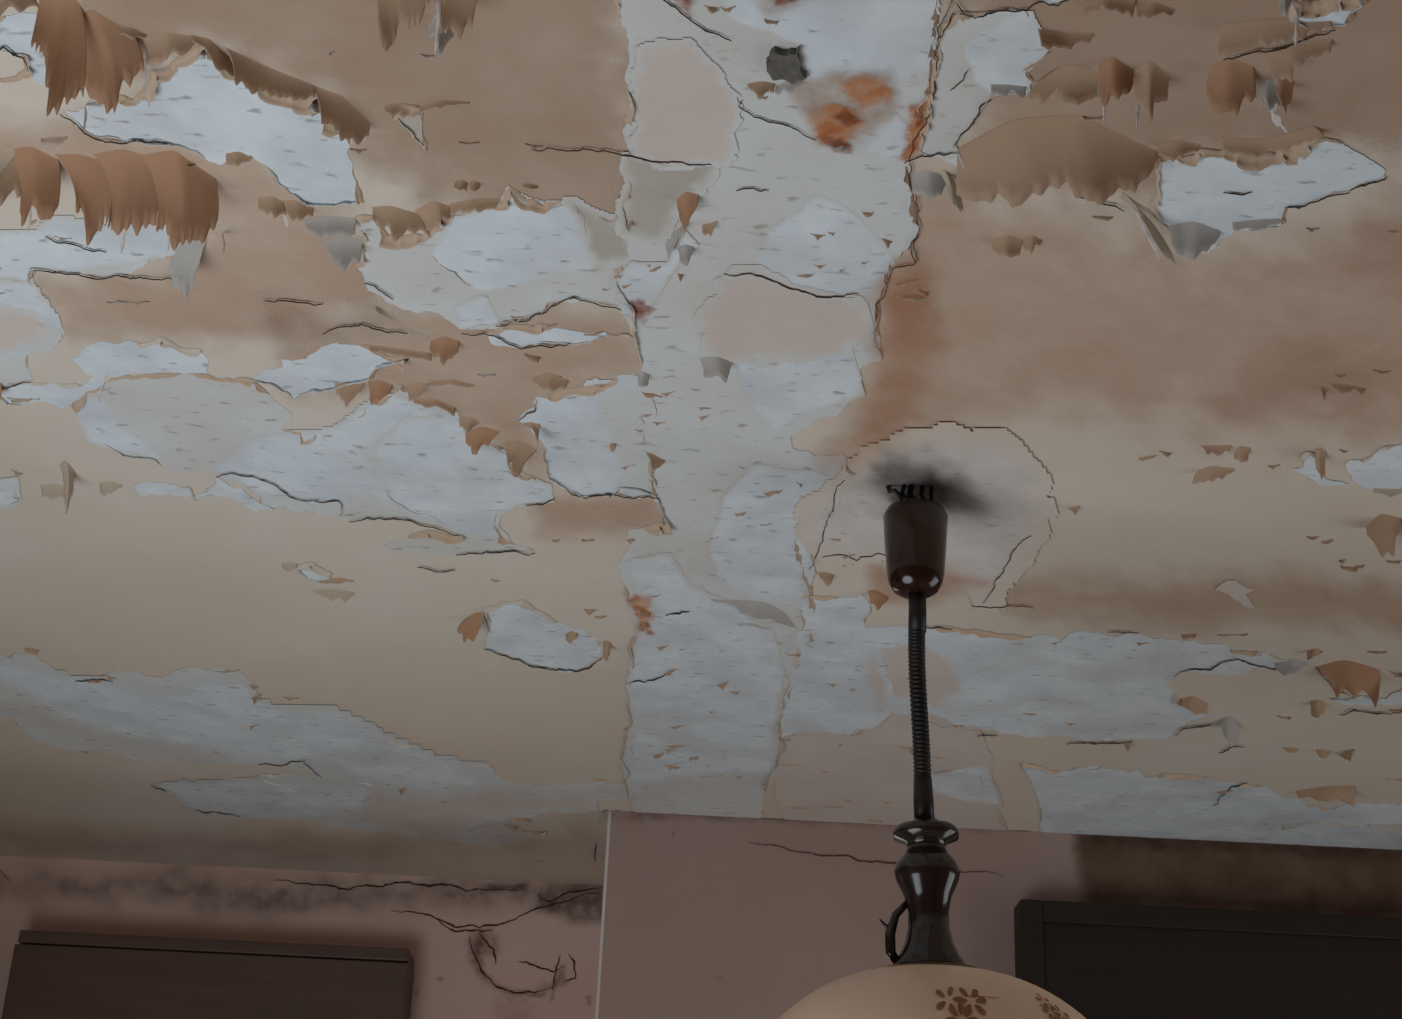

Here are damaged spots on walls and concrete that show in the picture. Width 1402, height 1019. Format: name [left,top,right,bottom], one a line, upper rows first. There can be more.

corrosion [809,81,890,152]
corrosion [901,106,923,161]
peeling [0,0,1385,825]
peeling [1366,514,1401,564]
crack [752,843,896,864]
crack [274,810,620,994]